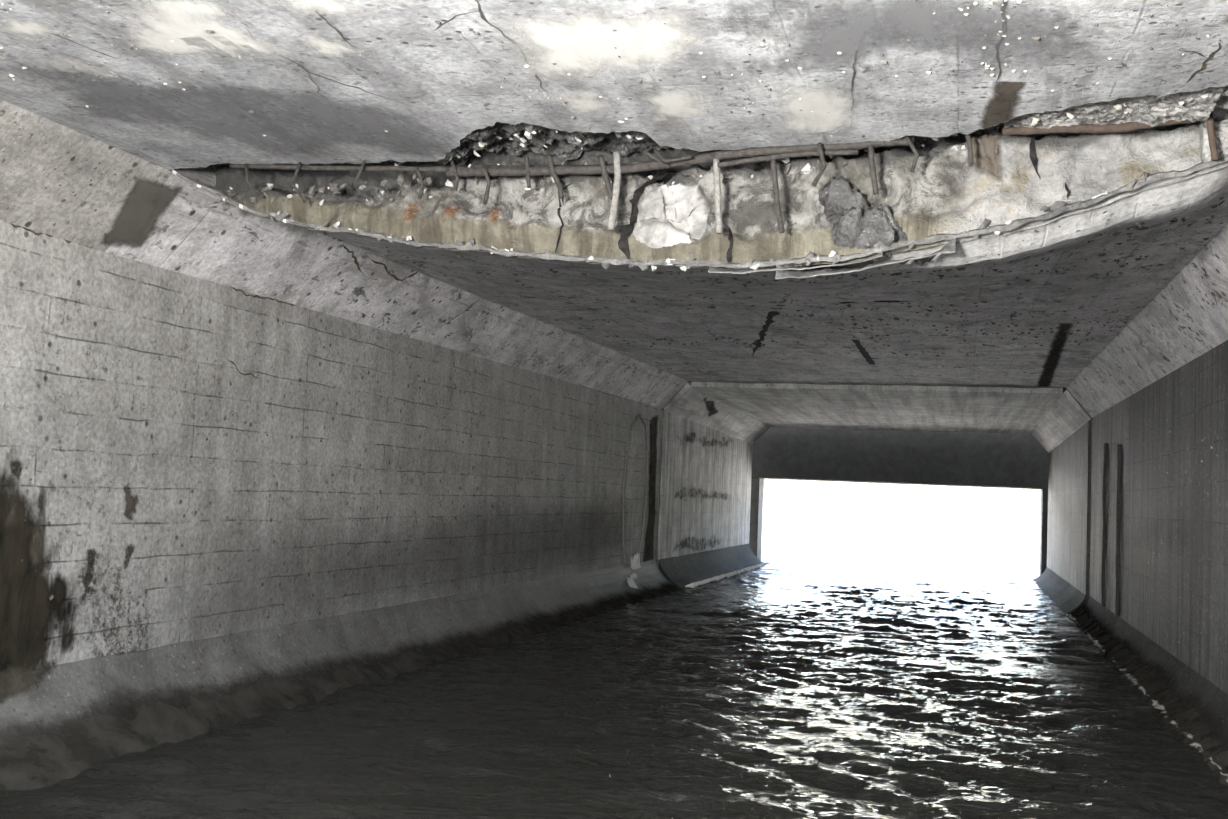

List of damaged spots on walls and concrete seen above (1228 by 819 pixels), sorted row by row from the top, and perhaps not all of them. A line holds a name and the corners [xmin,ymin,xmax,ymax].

crack [249,32,404,104]
crack [314,8,356,49]
crack [434,0,548,93]
crack [995,0,1007,82]
spalling [909,85,1228,162]
spalling [222,122,732,249]
spalling [781,155,848,182]
peeling [708,238,956,279]
leakage [0,416,680,793]